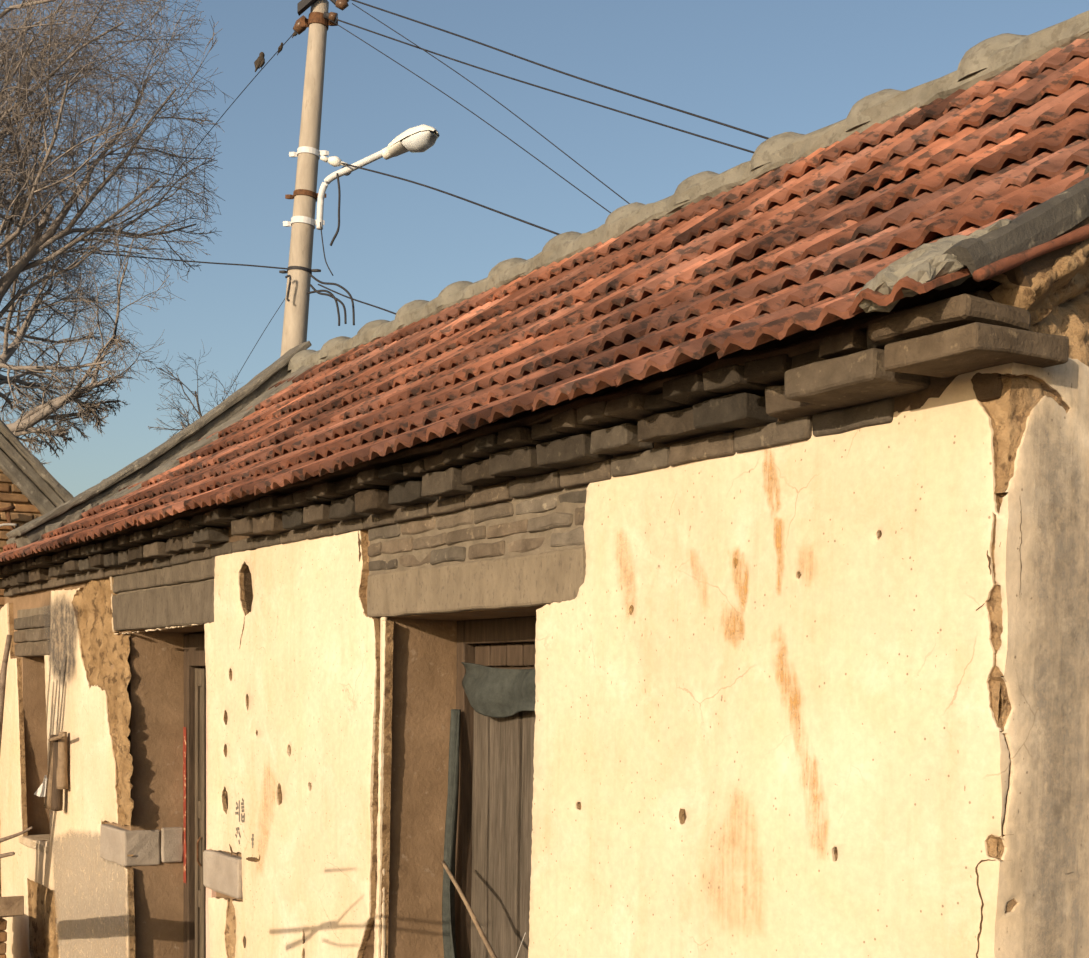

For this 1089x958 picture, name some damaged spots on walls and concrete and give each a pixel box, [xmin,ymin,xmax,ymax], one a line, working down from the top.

spalling [1028,289,1089,367]
crack [987,501,1022,598]
spalling [71,578,134,826]
leakage [1034,431,1089,958]
spalling [30,880,59,958]
crack [975,859,996,958]